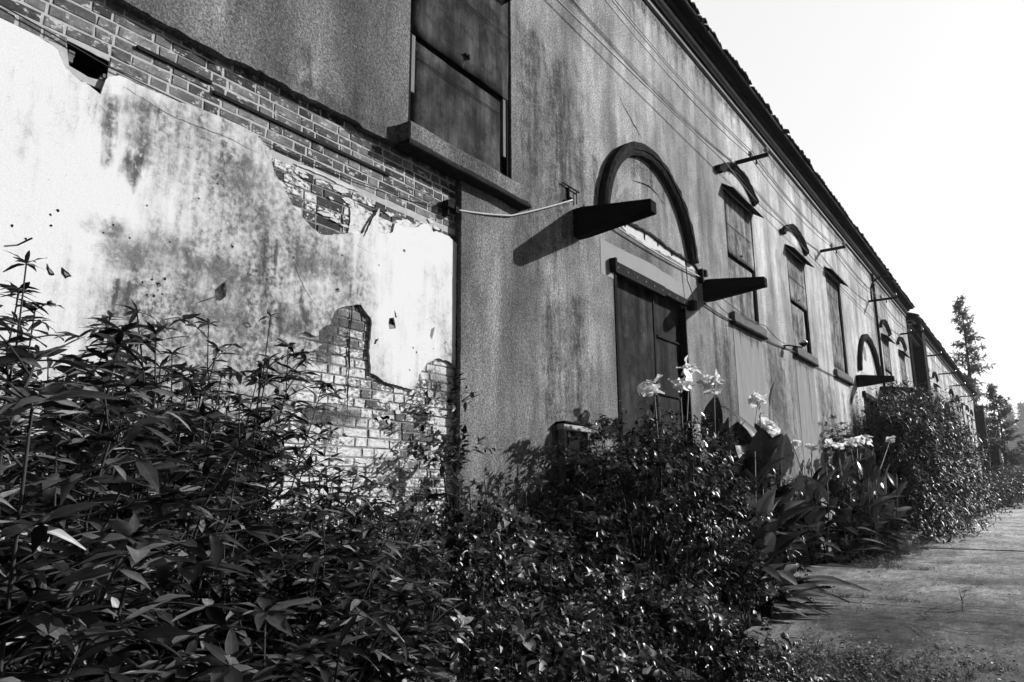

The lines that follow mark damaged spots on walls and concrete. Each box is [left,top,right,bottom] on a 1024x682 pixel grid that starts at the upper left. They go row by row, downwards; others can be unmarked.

leakage [105,103,117,161]
leakage [124,100,159,186]
spalling [0,0,456,266]
leakage [113,279,135,305]
leakage [110,226,149,266]
leakage [203,236,278,306]
leakage [277,237,352,364]
spalling [241,305,454,588]